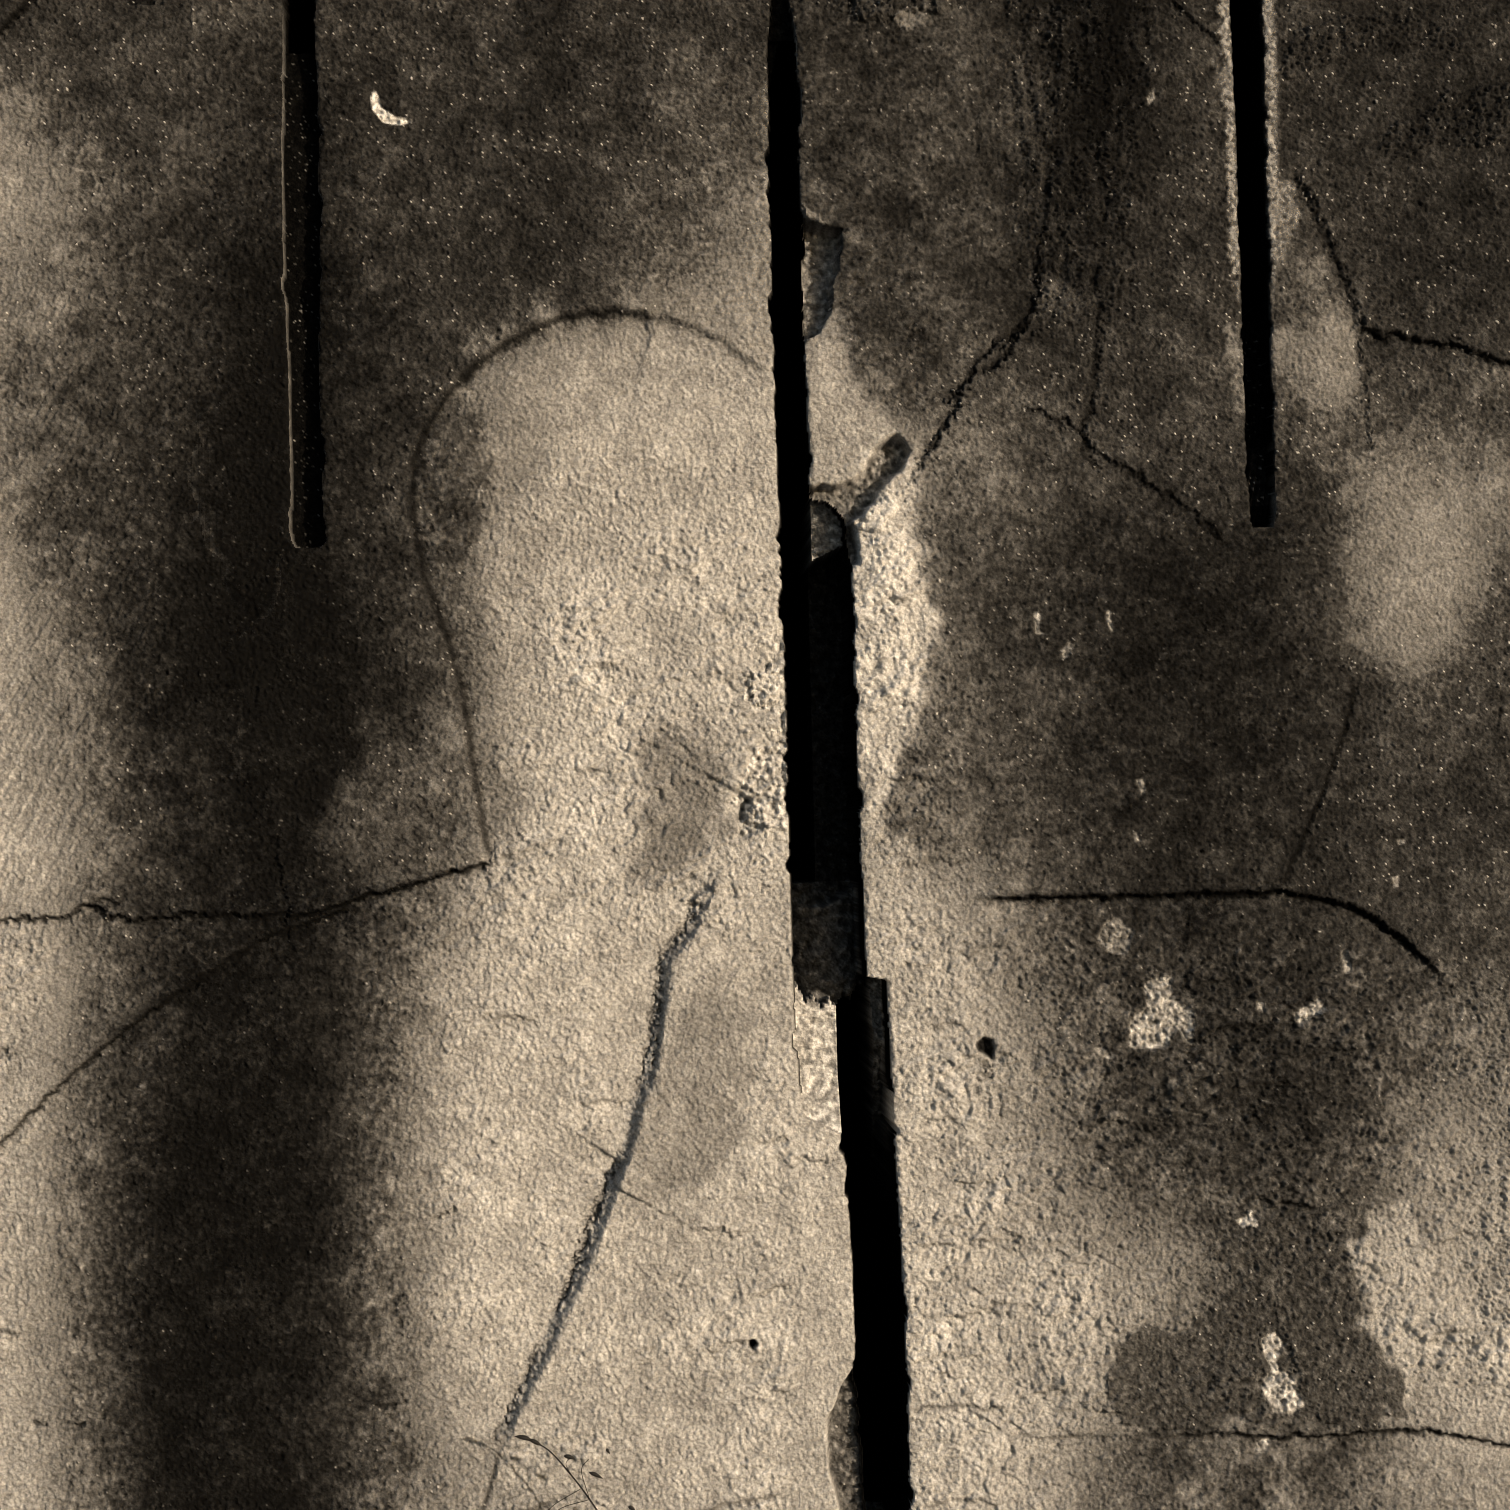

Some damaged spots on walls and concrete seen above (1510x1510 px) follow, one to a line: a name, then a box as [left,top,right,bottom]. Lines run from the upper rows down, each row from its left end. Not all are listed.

crack [904,229,1048,489]
crack [1018,298,1223,534]
crack [1291,174,1510,457]
crack [292,305,774,929]
crack [0,896,252,928]
leakage [34,15,492,1510]
leakage [950,439,1450,1221]
crack [976,664,1454,994]
crack [0,1042,115,1153]
crack [481,855,739,1510]
crack [912,1403,1510,1451]
leakage [1102,1426,1411,1510]